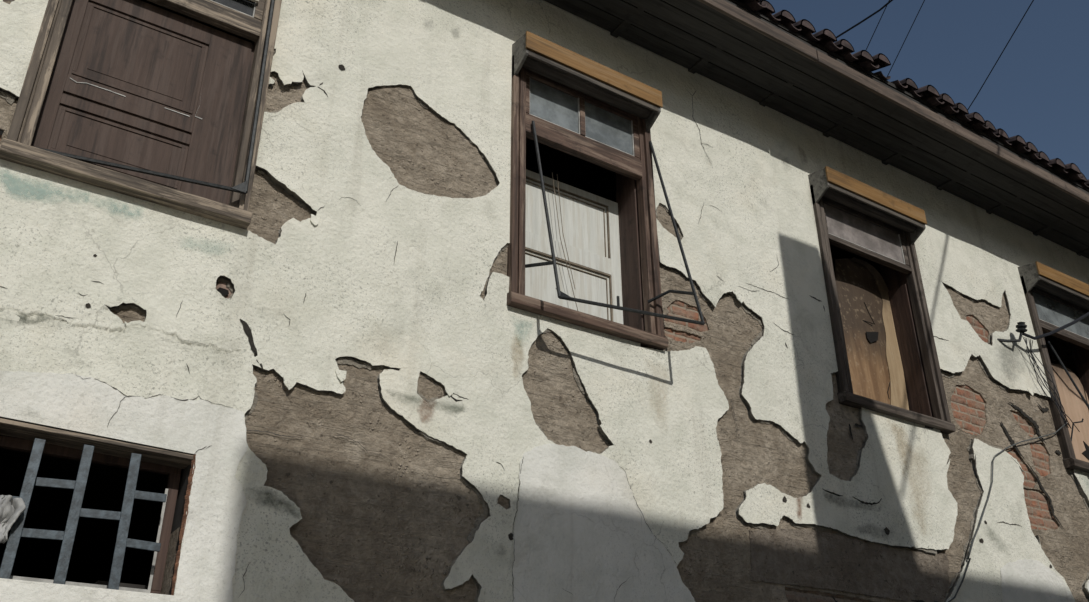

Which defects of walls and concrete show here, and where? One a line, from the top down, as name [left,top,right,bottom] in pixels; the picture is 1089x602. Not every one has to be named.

spalling [0,87,18,147]
spalling [264,71,315,113]
spalling [361,84,500,198]
spalling [246,166,320,244]
spalling [104,302,147,323]
spalling [215,275,235,299]
spalling [522,328,614,454]
spalling [659,261,1089,602]
spalling [245,356,511,602]